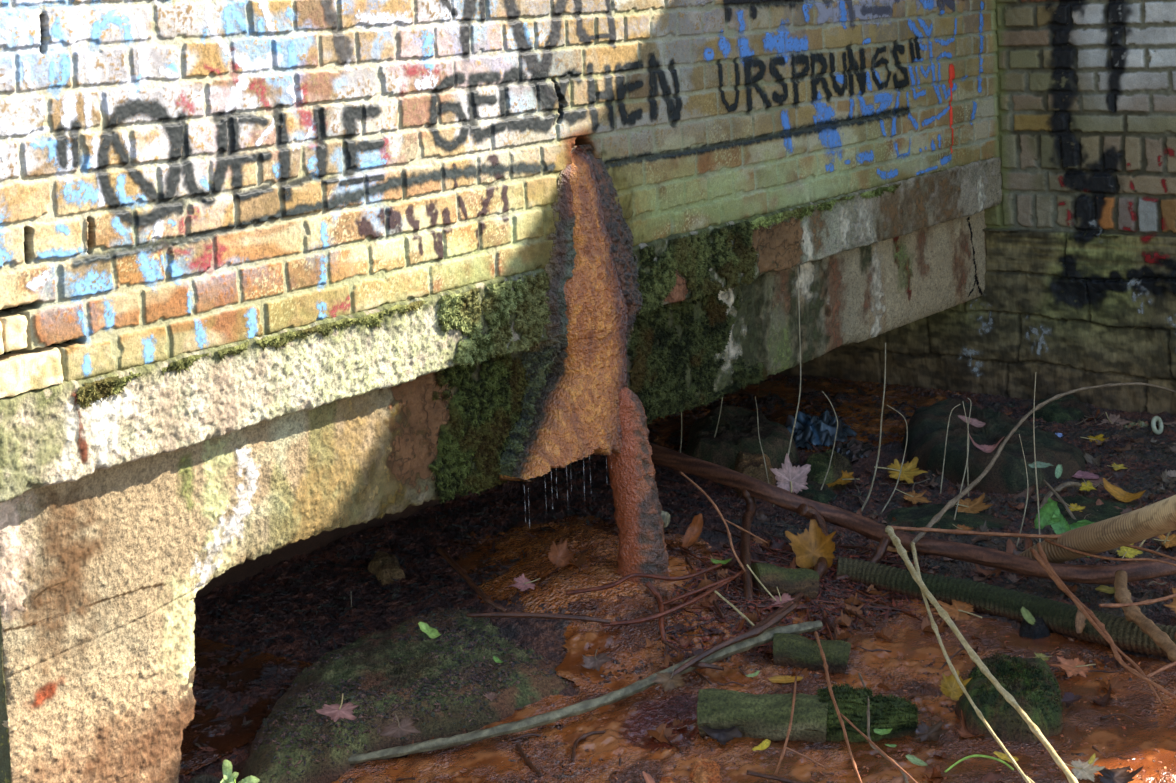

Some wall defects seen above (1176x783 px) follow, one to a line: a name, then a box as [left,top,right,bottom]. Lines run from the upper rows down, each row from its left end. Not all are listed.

corrosion [565,132,598,165]
crack [967,217,983,297]
crack [3,580,69,632]
crack [89,579,183,606]